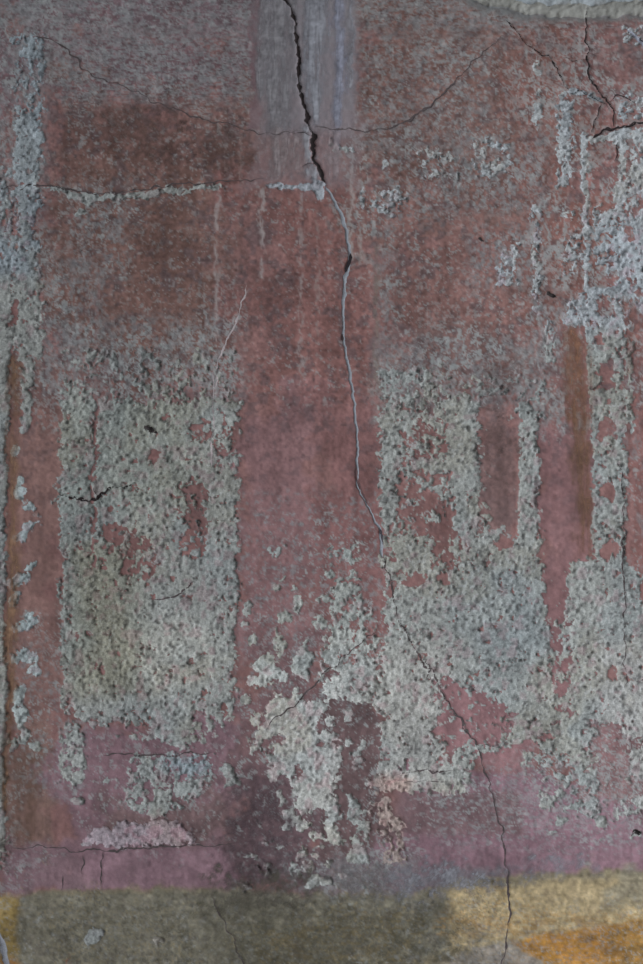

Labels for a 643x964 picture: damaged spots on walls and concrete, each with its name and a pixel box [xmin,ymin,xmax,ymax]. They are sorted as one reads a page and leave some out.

peeling [0,33,223,869]
crack [0,0,512,964]
spalling [56,88,643,890]
crack [505,11,643,160]